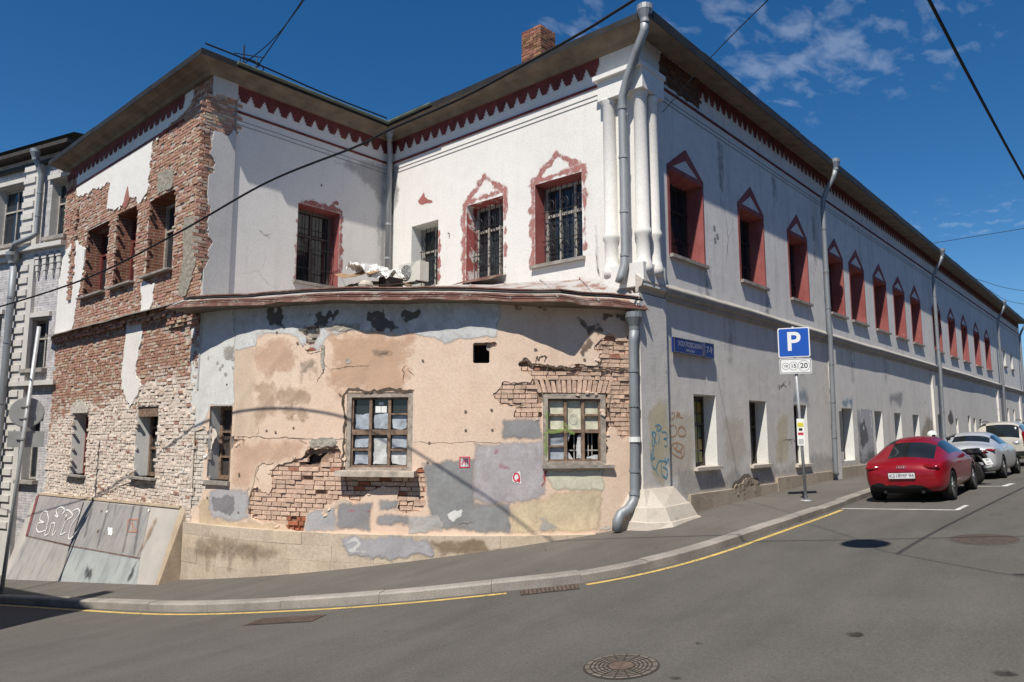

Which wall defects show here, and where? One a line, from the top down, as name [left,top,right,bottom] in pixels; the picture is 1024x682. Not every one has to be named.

peeling [460,174,508,284]
peeling [528,151,588,270]
spalling [44,77,500,531]
crack [310,351,413,467]
spalling [490,311,630,455]
crack [238,425,307,516]